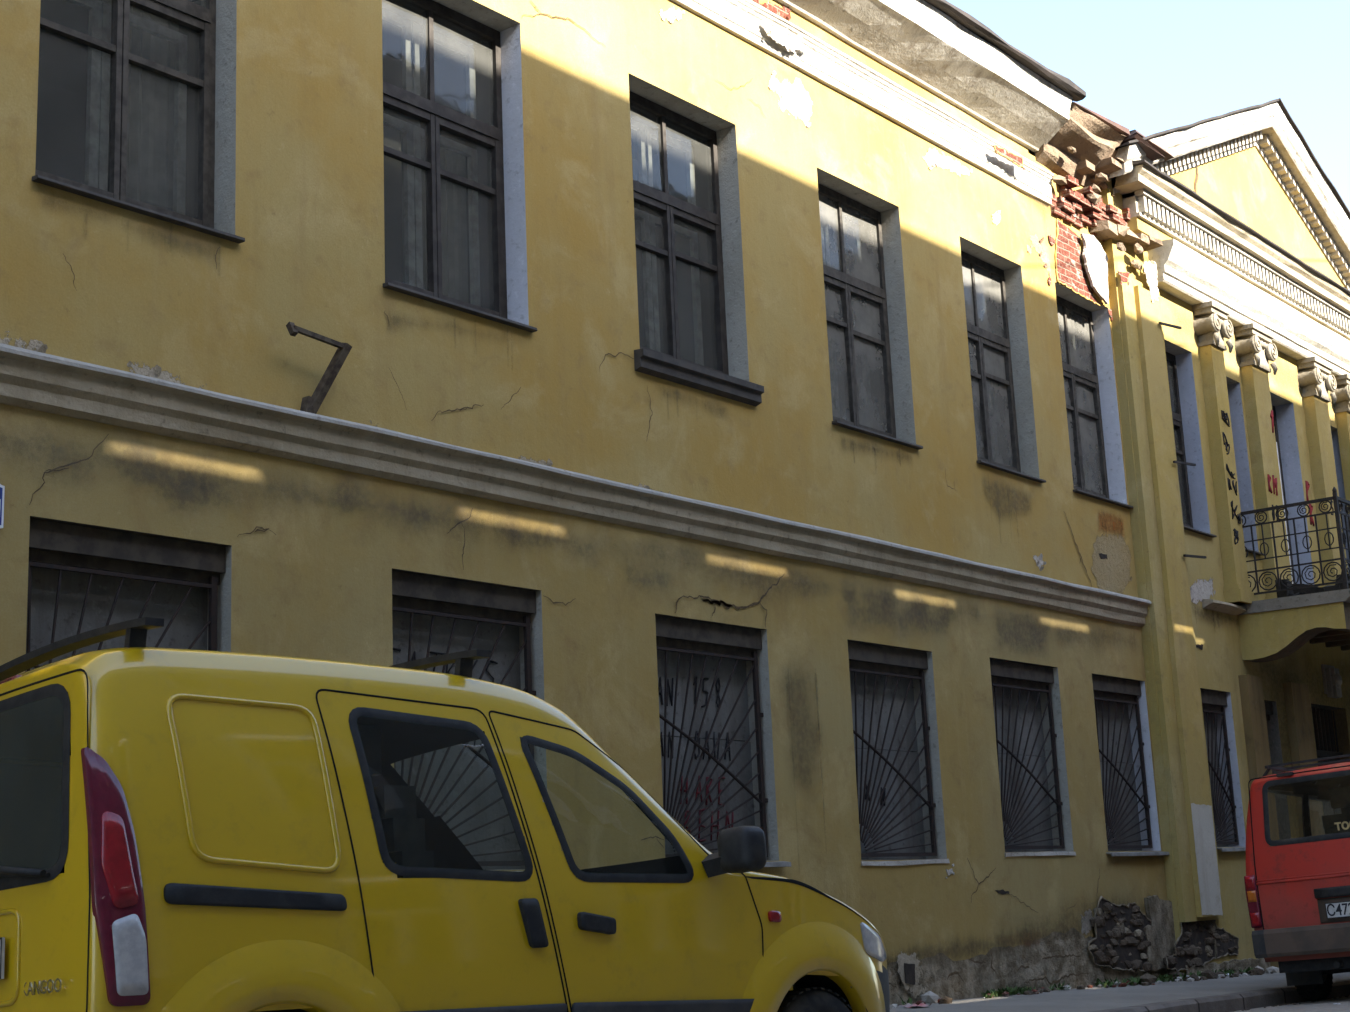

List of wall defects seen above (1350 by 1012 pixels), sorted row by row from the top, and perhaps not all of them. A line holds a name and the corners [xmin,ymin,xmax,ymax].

crack [522,1,606,47]
peeling [768,70,813,128]
peeling [923,148,973,176]
spalling [1027,200,1159,321]
crack [29,434,109,505]
crack [675,574,785,627]
spalling [887,895,1271,1006]